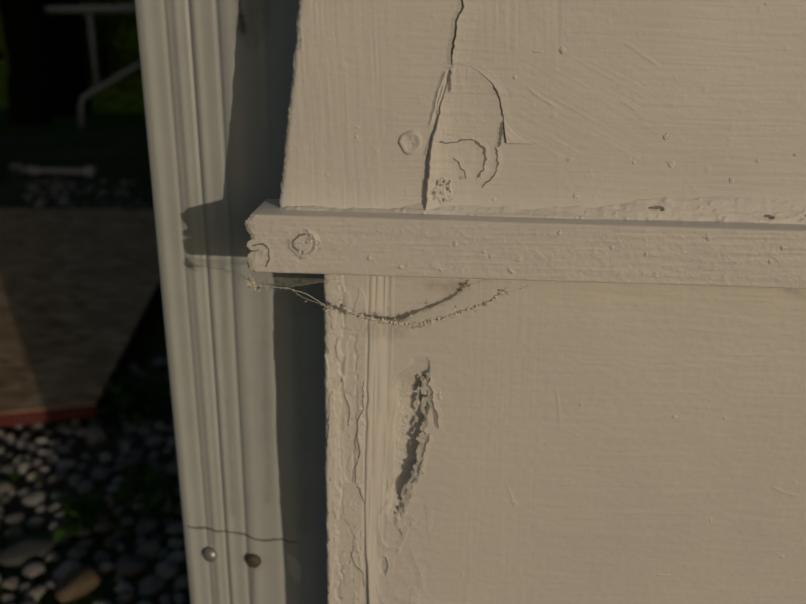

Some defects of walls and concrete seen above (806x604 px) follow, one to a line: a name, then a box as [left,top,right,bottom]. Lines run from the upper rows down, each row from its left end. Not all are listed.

crack [434,0,511,192]
crack [186,524,300,544]
peeling [388,363,444,535]